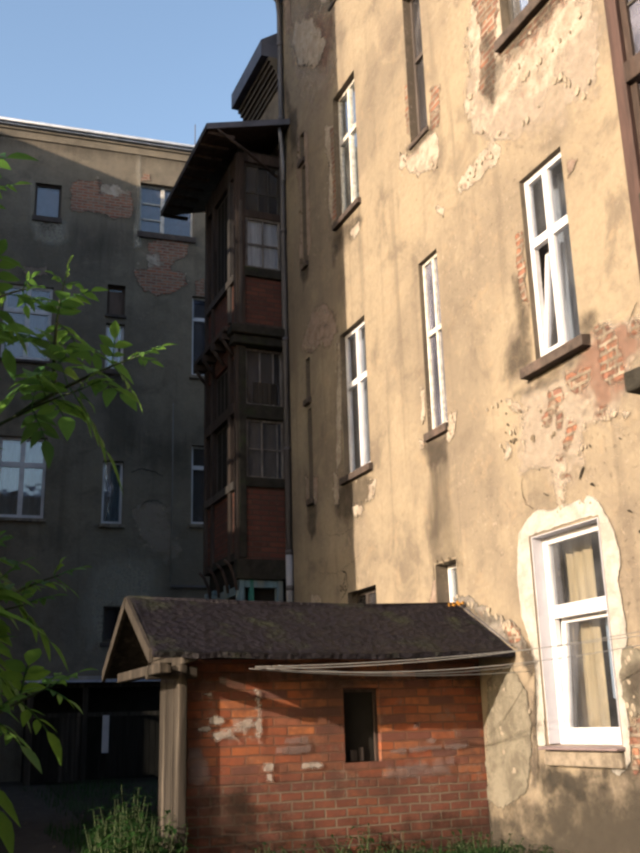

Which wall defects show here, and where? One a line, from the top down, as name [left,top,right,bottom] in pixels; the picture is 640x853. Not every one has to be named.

peeling [283,0,329,68]
spalling [399,84,441,178]
peeling [457,0,600,195]
flaking render [69,176,134,220]
flaking render [134,239,205,297]
peeling [486,317,640,511]